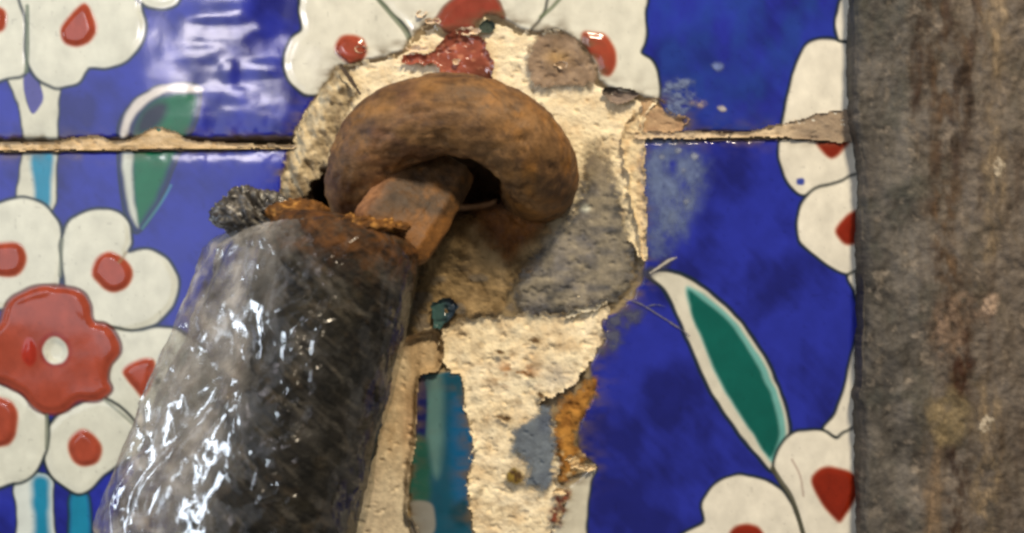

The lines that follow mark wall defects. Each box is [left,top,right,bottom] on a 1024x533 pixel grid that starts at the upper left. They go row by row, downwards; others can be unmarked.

crack [0,146,296,154]
spalling [301,10,690,276]
crack [682,136,829,144]
corrosion [262,197,411,234]
spalling [439,296,610,533]
corrosion [553,379,598,495]